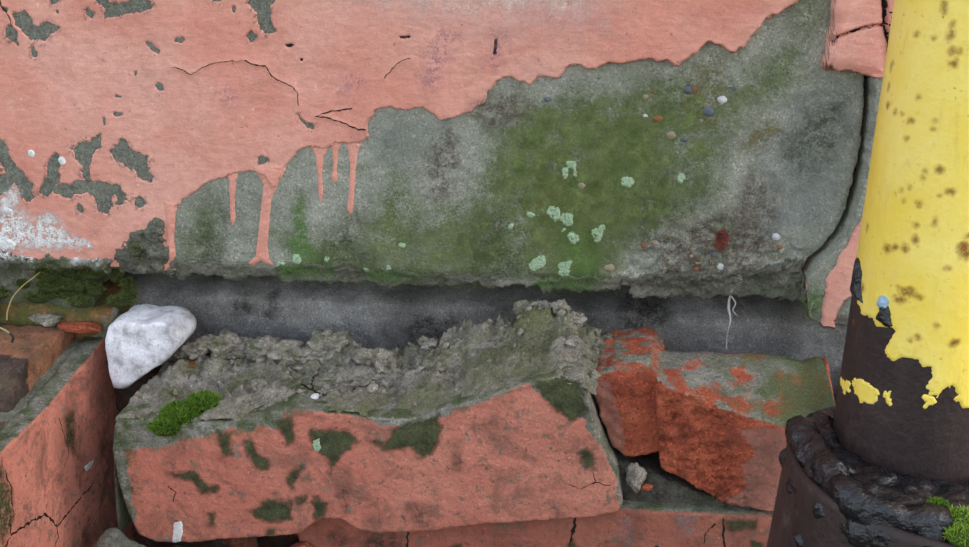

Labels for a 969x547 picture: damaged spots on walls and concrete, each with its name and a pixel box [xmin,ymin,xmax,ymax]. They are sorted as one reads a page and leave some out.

crack [830,0,893,46]
crack [173,60,366,131]
peeling [0,0,883,325]
damp [0,187,97,262]
crack [5,470,93,547]
crack [569,518,577,545]